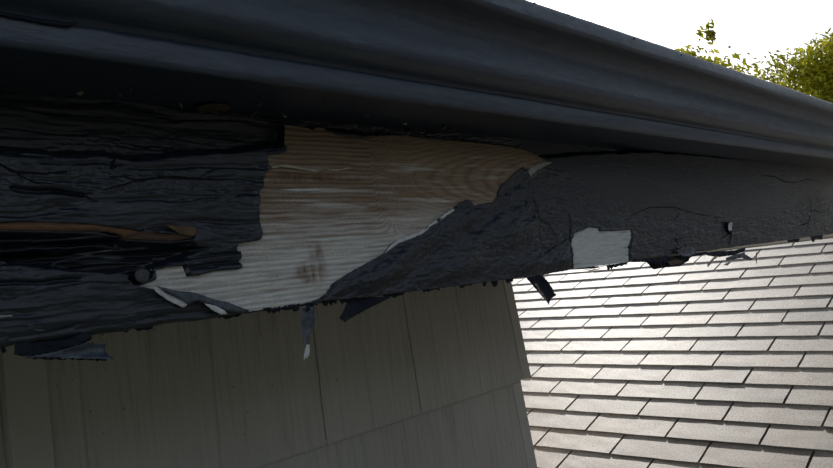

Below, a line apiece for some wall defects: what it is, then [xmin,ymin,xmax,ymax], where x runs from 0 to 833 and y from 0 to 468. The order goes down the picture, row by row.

peeling [140,125,556,360]
peeling [571,227,757,271]
peeling [0,332,114,361]